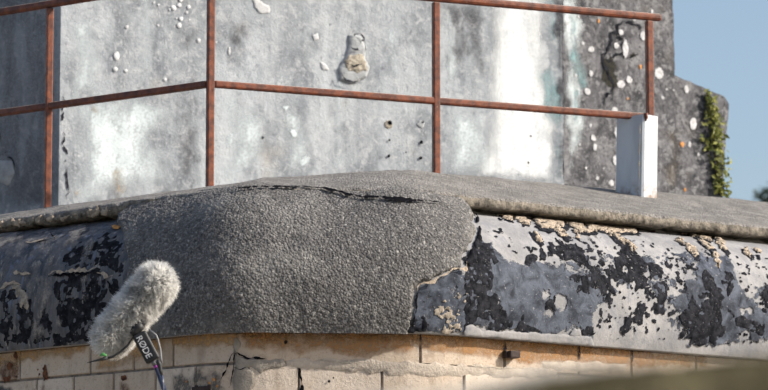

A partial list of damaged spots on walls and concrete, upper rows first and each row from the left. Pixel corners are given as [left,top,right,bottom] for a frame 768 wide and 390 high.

crack [61,97,69,196]
crack [238,185,439,202]
peeling [0,229,124,349]
peeling [407,213,768,348]
corrosion [0,345,84,382]
crack [219,351,265,386]